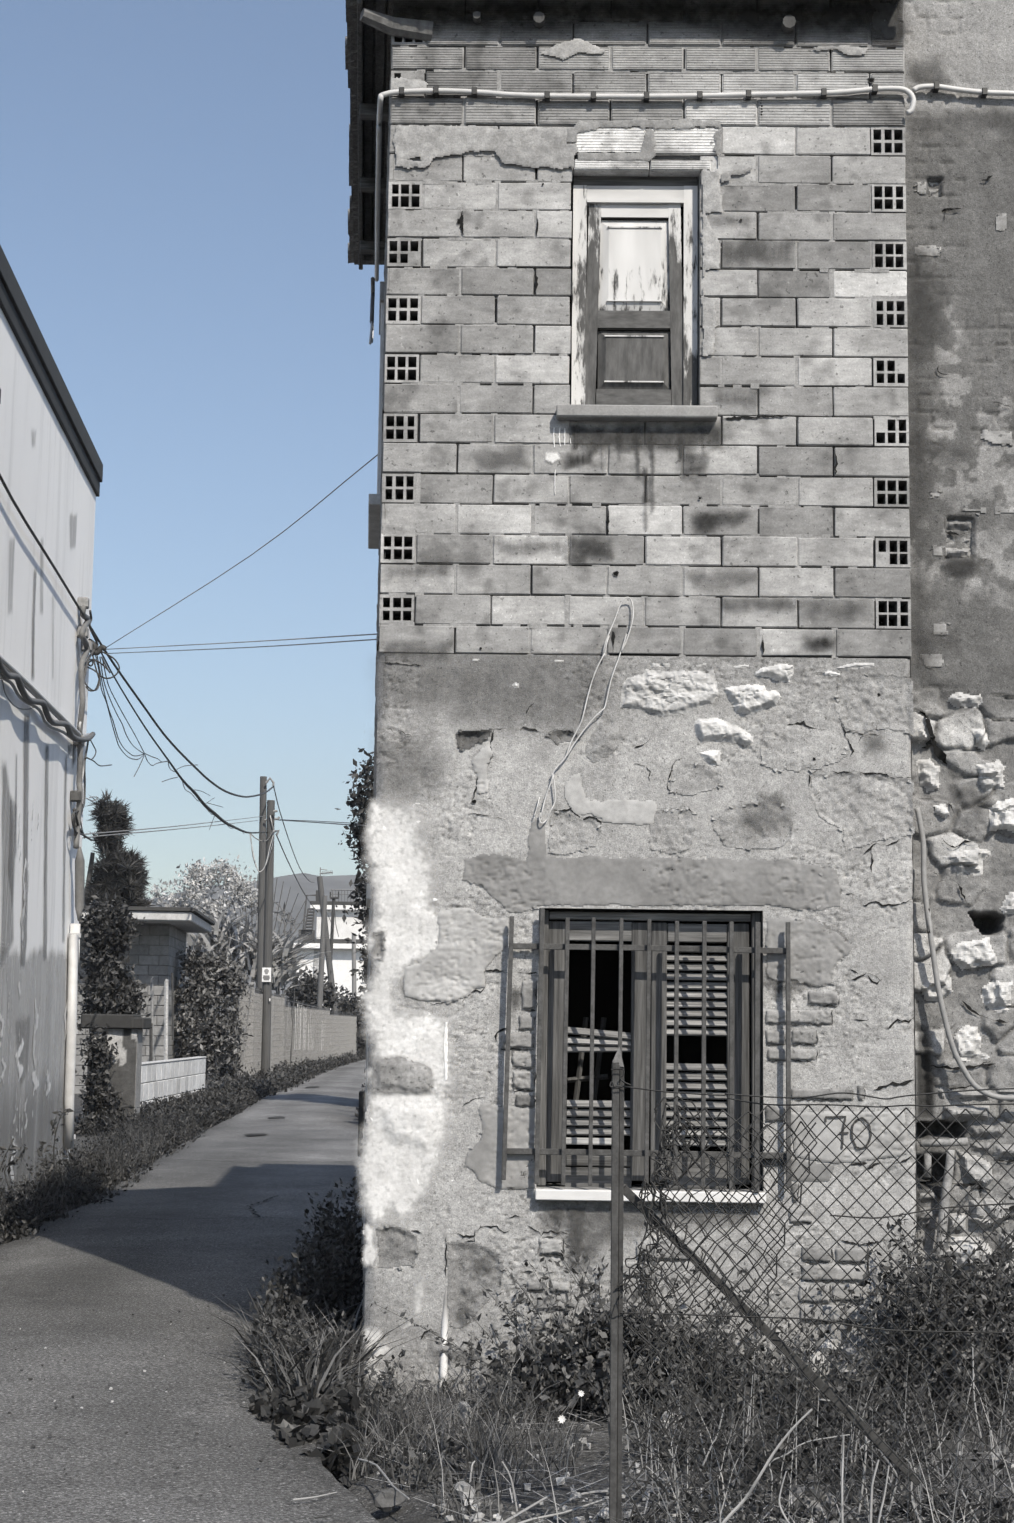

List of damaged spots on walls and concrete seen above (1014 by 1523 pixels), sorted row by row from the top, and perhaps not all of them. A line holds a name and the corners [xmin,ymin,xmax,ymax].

damp [553,425,720,502]
flaking render [920,652,944,669]
flaking render [947,692,983,708]
flaking render [456,728,492,751]
flaking render [620,663,949,861]
flaking render [971,728,1014,833]
flaking render [942,848,991,876]
flaking render [999,892,1014,914]
flaking render [922,937,1013,1013]
peeling [358,801,468,1331]
flaking render [953,1025,990,1062]
peeling [364,1329,393,1382]